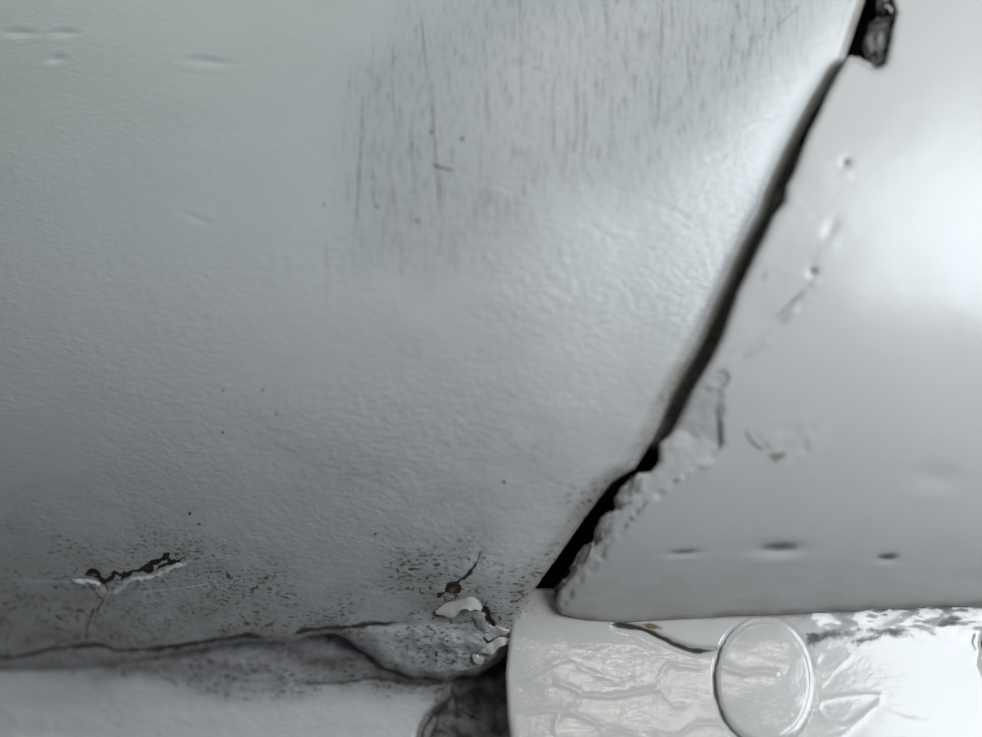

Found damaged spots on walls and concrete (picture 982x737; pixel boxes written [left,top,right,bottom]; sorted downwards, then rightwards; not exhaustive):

spalling [553,474,644,599]
spalling [436,551,510,664]